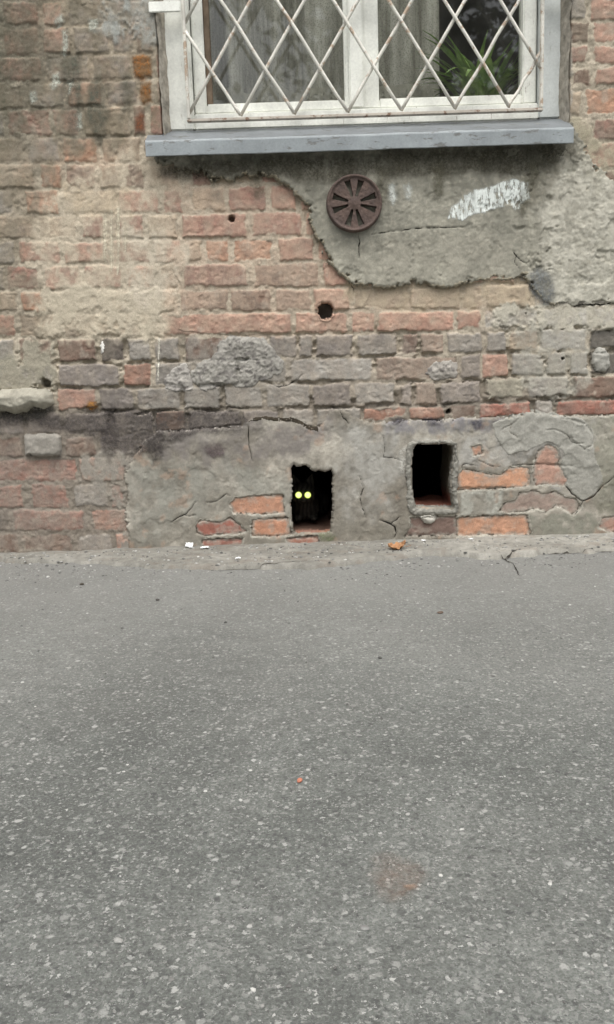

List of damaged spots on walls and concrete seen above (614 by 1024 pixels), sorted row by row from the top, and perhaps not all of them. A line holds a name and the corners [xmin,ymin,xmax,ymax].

crack [248,416,318,458]
flaking render [405,409,603,538]
spalling [194,492,321,546]